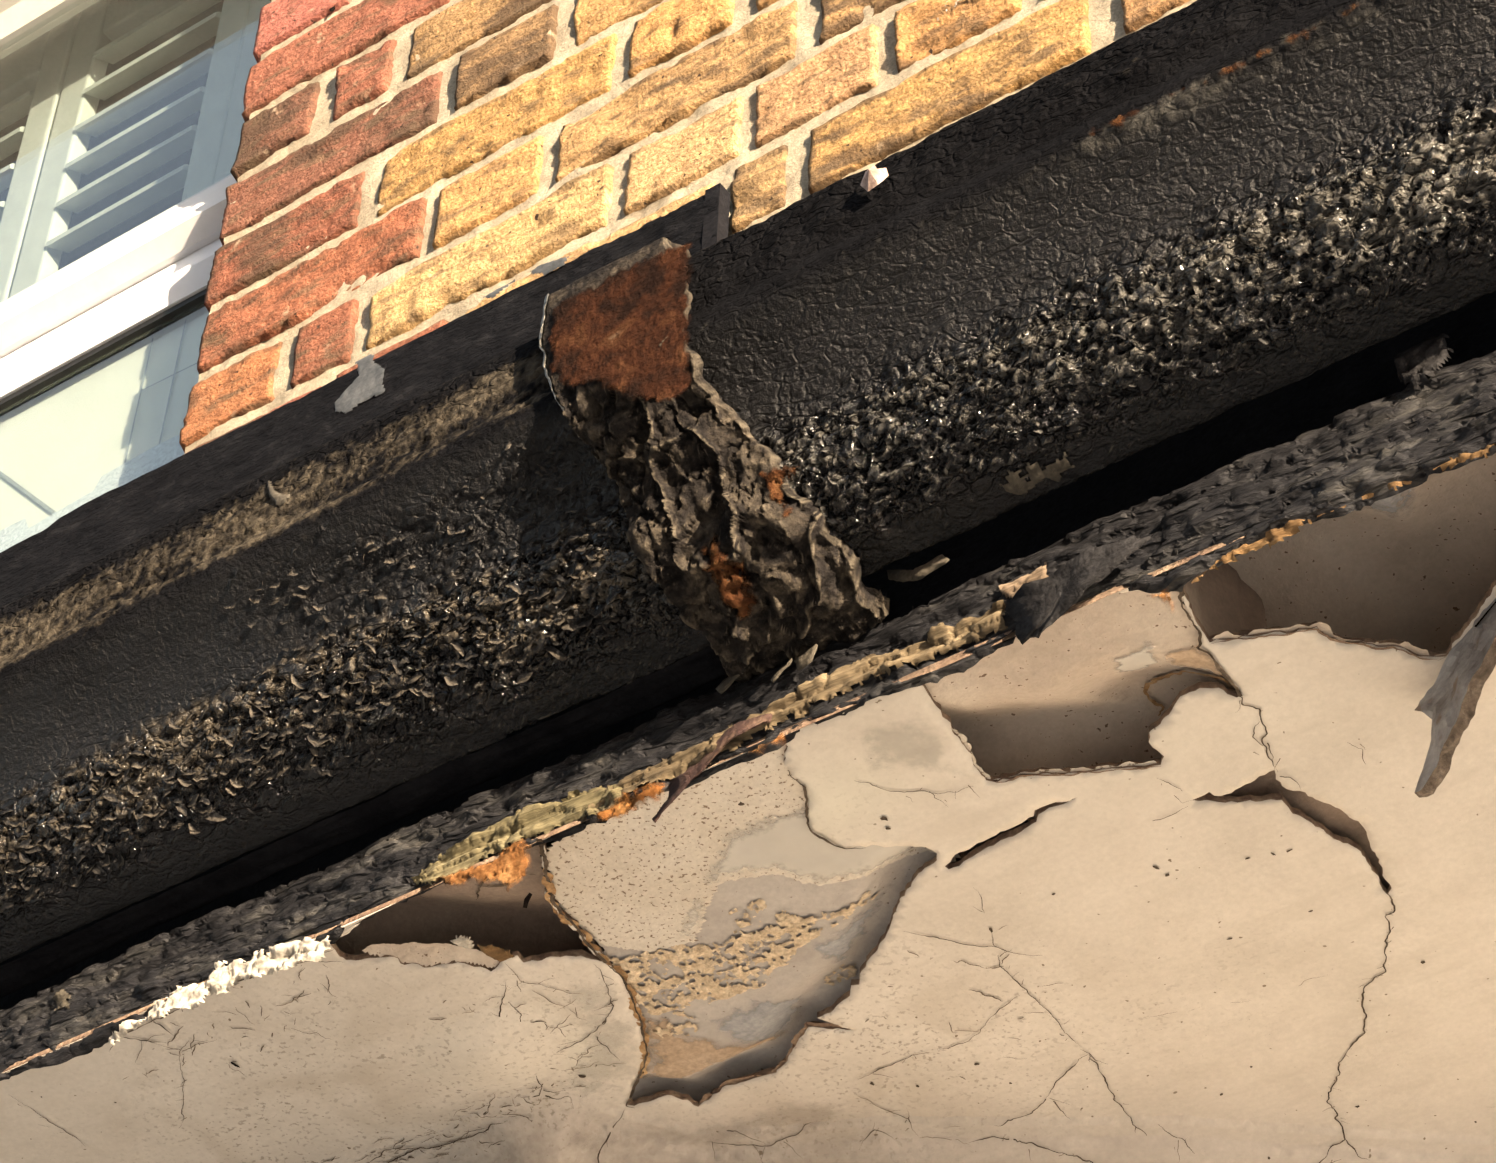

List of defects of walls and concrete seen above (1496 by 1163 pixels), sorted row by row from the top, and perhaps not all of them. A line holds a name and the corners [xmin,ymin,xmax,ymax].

rust [548,244,692,402]
rust [703,536,757,619]
rust [758,467,796,516]
spalling [925,452,1496,798]
spalling [335,713,970,1108]
spalling [1207,770,1390,889]
crack [110,951,340,1128]
crack [322,963,624,1163]
crack [706,1122,811,1159]
crack [1319,892,1396,1163]